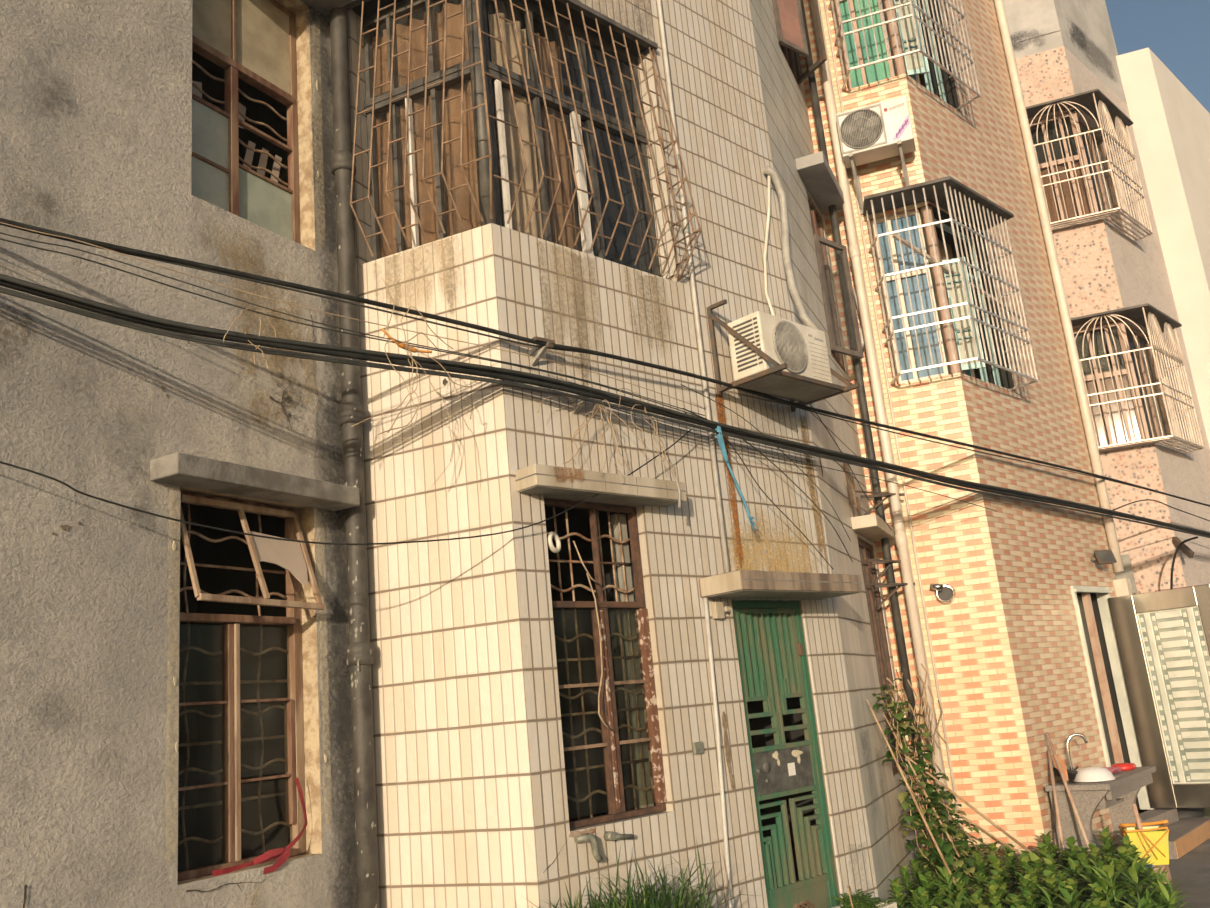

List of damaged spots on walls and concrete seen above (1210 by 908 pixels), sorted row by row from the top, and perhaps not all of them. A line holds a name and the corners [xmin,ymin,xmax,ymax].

water stain [306,5,339,346]
rust [554,467,583,482]
rust [715,393,828,573]
water stain [320,509,357,908]